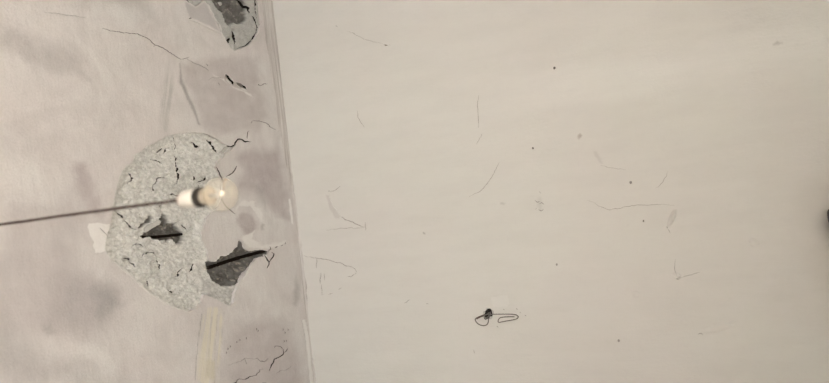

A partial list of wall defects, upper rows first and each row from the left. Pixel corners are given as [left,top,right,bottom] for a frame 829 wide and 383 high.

spalling [184,0,260,51]
crack [102,28,221,85]
crack [216,121,274,214]
spalling [105,132,269,312]
crack [229,346,289,383]